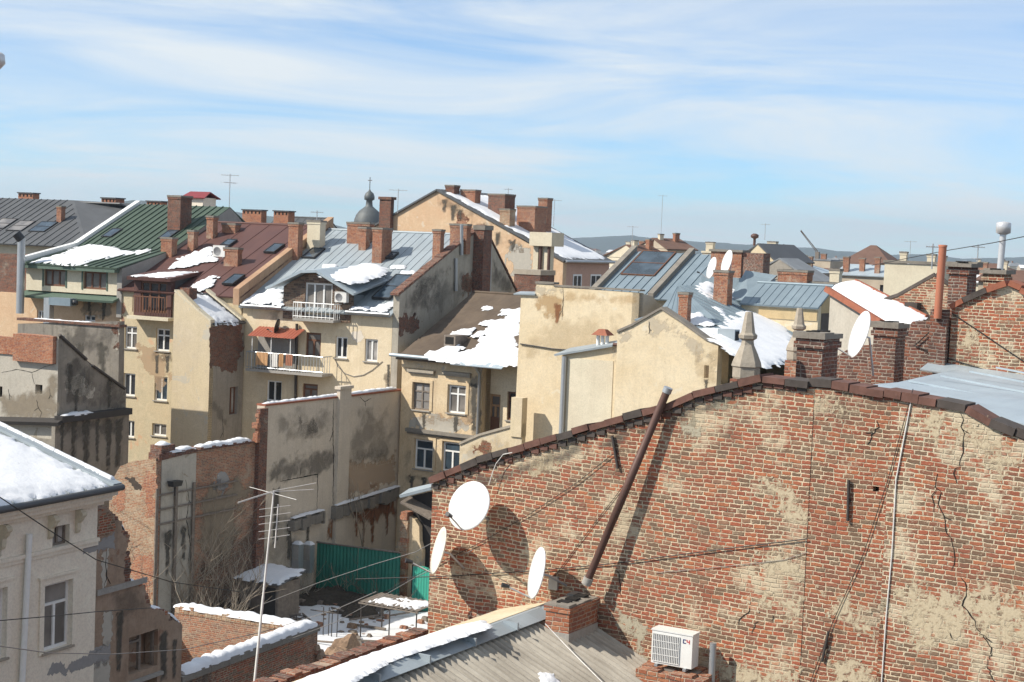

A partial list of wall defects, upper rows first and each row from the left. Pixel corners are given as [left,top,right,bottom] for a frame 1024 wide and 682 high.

damp [0,302,123,470]
flaking render [209,321,245,373]
flaking render [398,313,420,337]
flaking render [97,464,181,624]
corrosion [353,501,396,545]
crack [931,413,995,682]